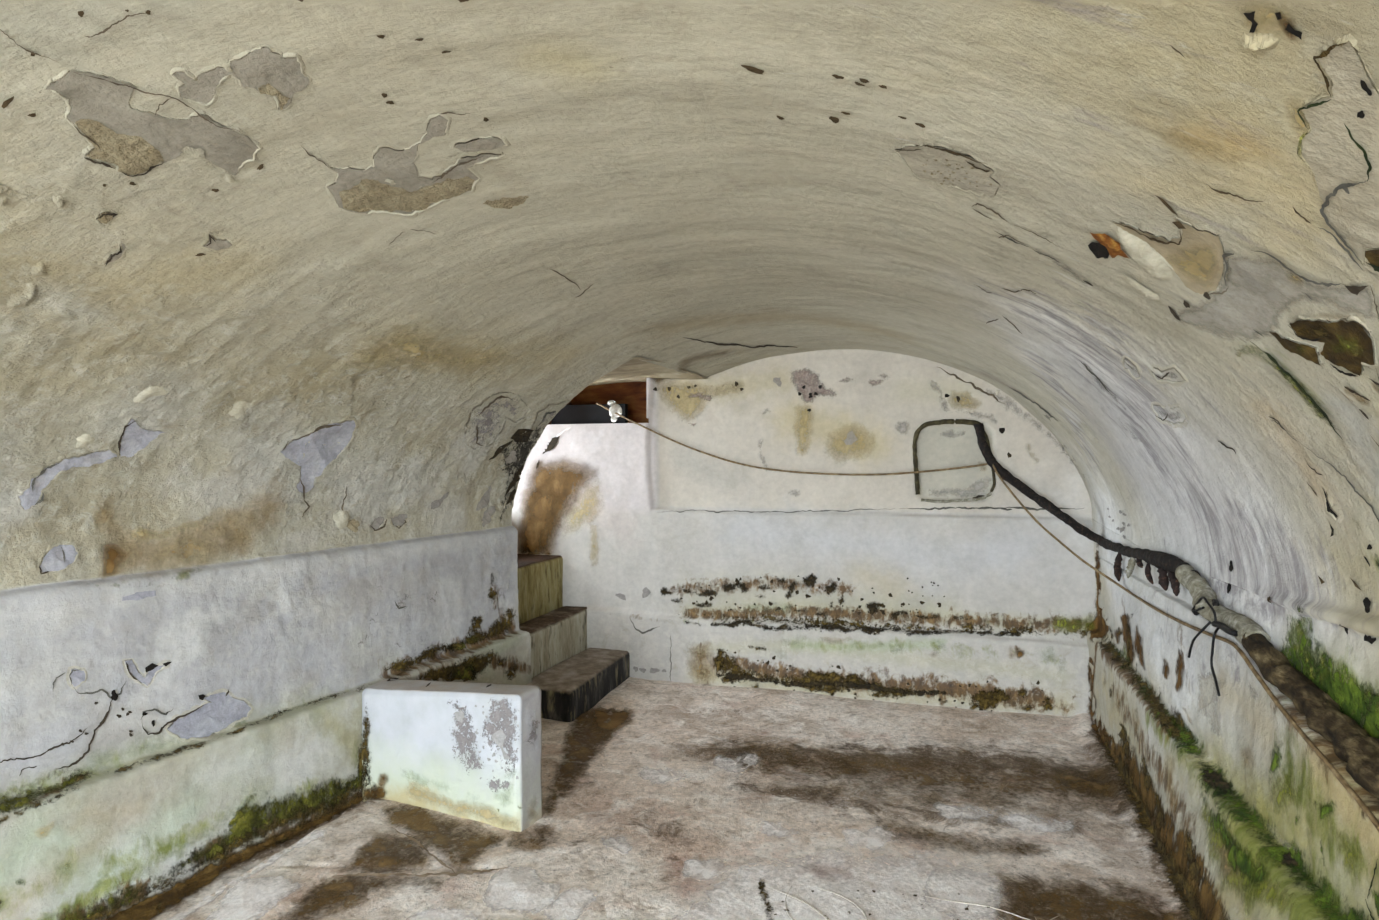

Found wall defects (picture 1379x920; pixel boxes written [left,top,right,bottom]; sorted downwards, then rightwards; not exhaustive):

spalling [1240,11,1302,51]
flaking render [42,44,313,192]
flaking render [325,112,528,218]
flaking render [1110,34,1379,428]
flaking render [16,415,169,513]
water stain [693,649,1053,712]
water stain [660,573,1094,638]
water stain [1110,614,1145,686]
water stain [1159,649,1183,698]
crack [0,700,112,776]
flaking render [448,698,539,792]
water stain [166,707,632,920]